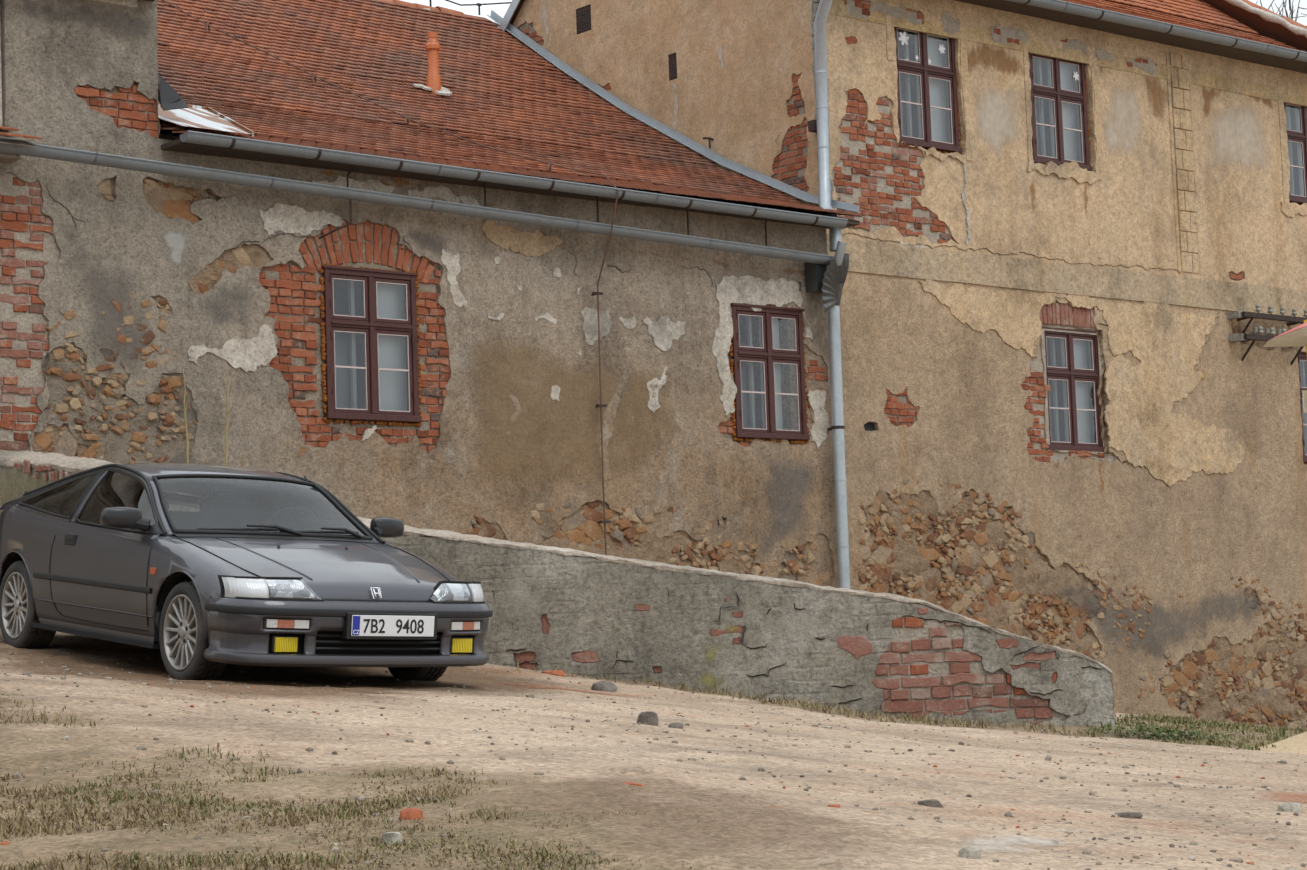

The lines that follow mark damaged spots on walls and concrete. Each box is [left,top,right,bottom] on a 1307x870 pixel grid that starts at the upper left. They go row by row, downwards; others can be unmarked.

spalling [74,82,159,139]
spalling [772,74,809,192]
spalling [831,88,972,248]
flaking render [0,173,467,481]
flaking render [576,287,686,357]
flaking render [712,274,814,447]
flaking render [806,359,830,449]
spalling [864,387,919,431]
flaking render [918,279,1304,487]
spalling [530,499,830,585]
spalling [837,477,1155,724]
spalling [1114,575,1307,730]